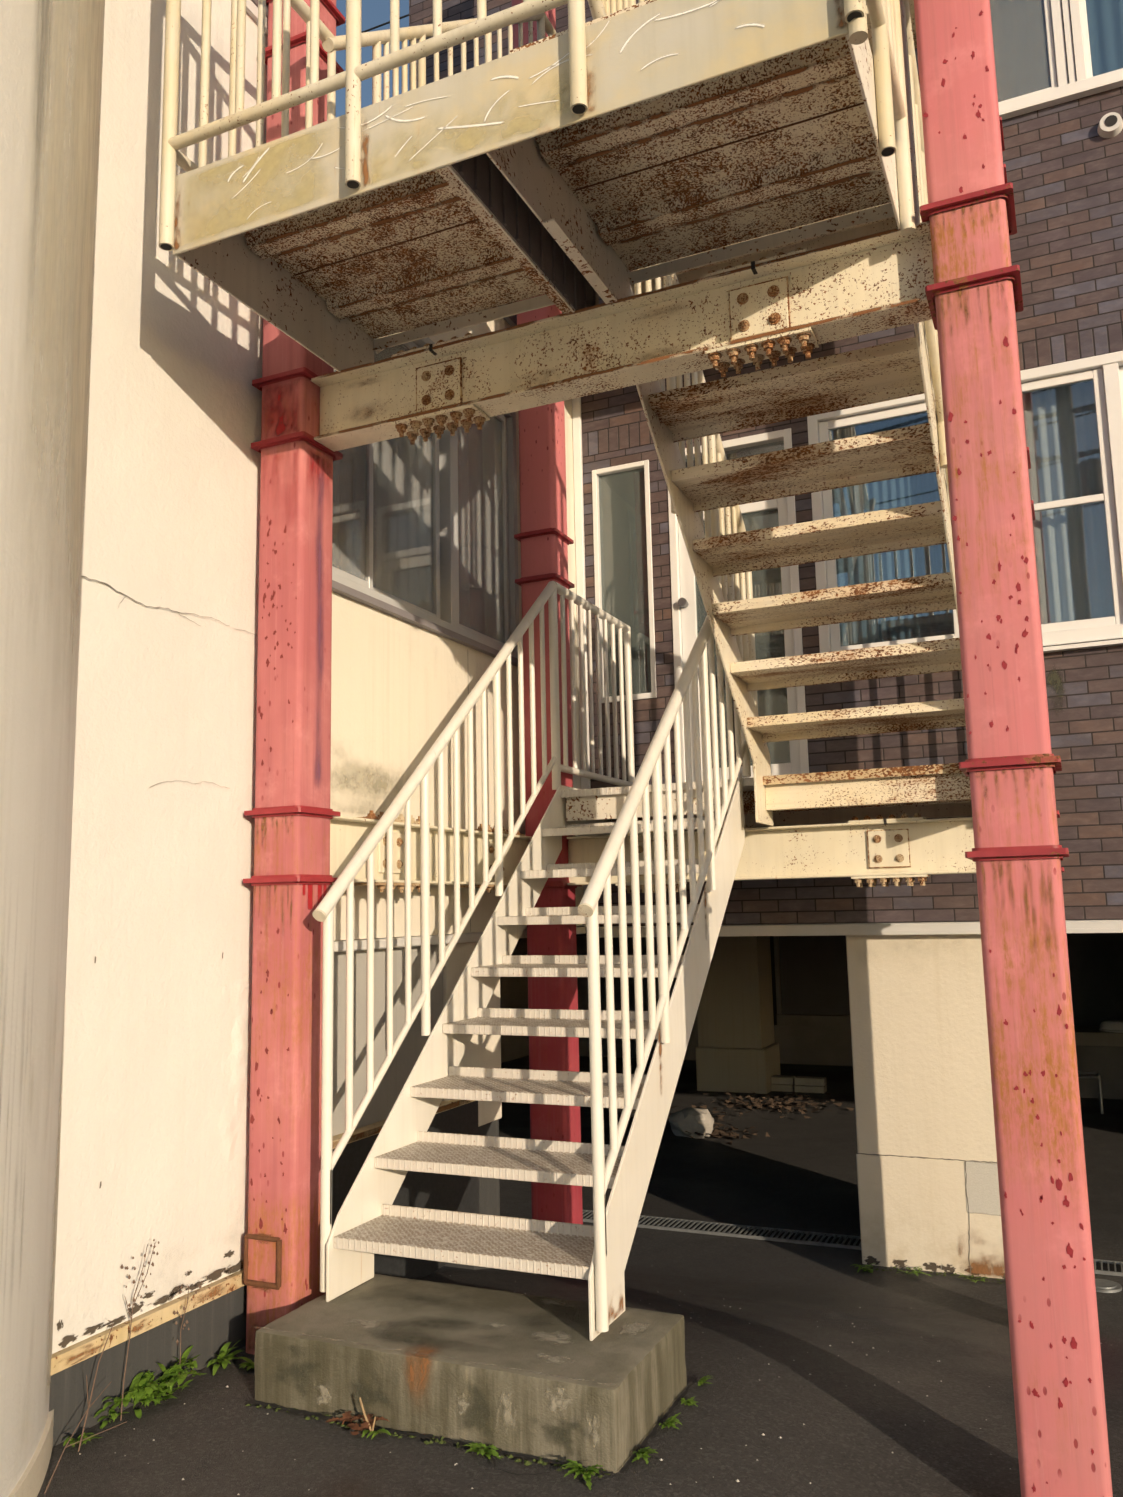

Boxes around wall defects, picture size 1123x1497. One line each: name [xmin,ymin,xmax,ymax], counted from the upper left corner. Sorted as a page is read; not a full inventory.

rust [557,62,841,164]
rust [263,182,462,256]
rust [612,157,873,243]
rust [557,228,900,317]
rust [321,321,535,377]
rust [729,299,920,344]
rust [319,346,709,438]
crack [82,576,253,634]
peeling [57,1250,244,1348]
water stain [357,1319,464,1347]
water stain [537,1332,569,1362]
water stain [550,1388,598,1448]